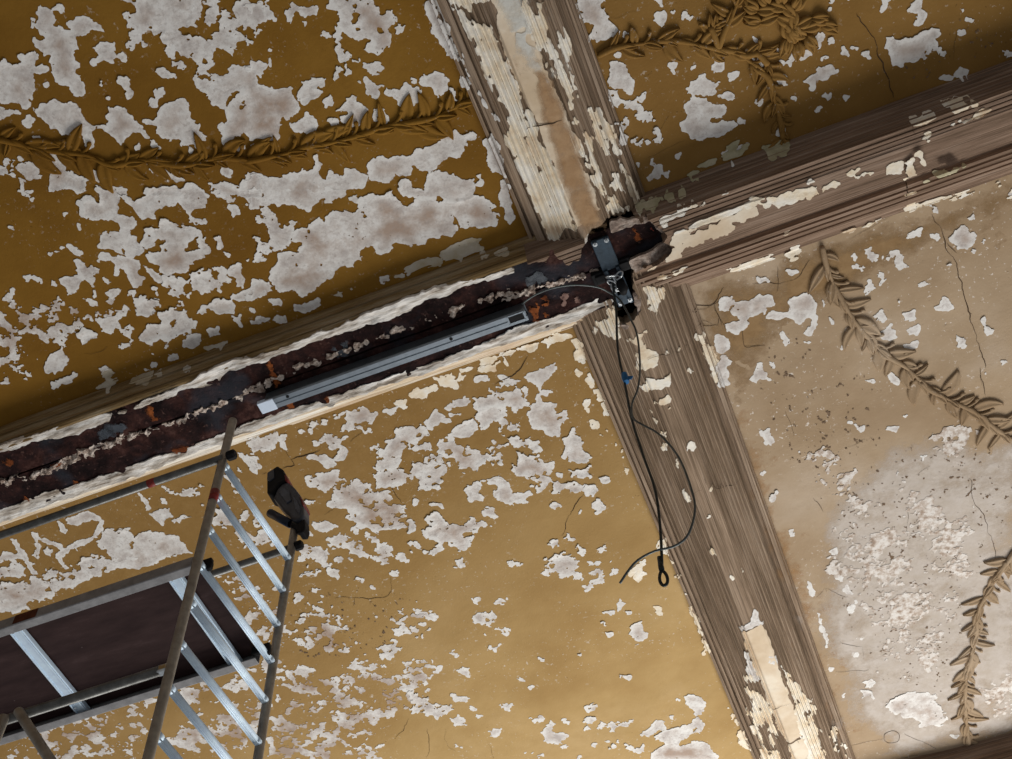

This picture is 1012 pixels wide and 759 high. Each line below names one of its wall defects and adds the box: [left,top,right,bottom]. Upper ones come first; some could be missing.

peeling [0,0,500,153]
water stain [499,0,601,227]
peeling [572,52,748,280]
crack [857,16,894,98]
peeling [884,0,946,68]
peeling [0,129,598,487]
corrosion [529,296,549,322]
peeling [694,276,834,388]
crack [932,215,986,392]
spalling [0,298,614,759]
water stain [827,448,1012,751]
peeling [583,694,719,759]